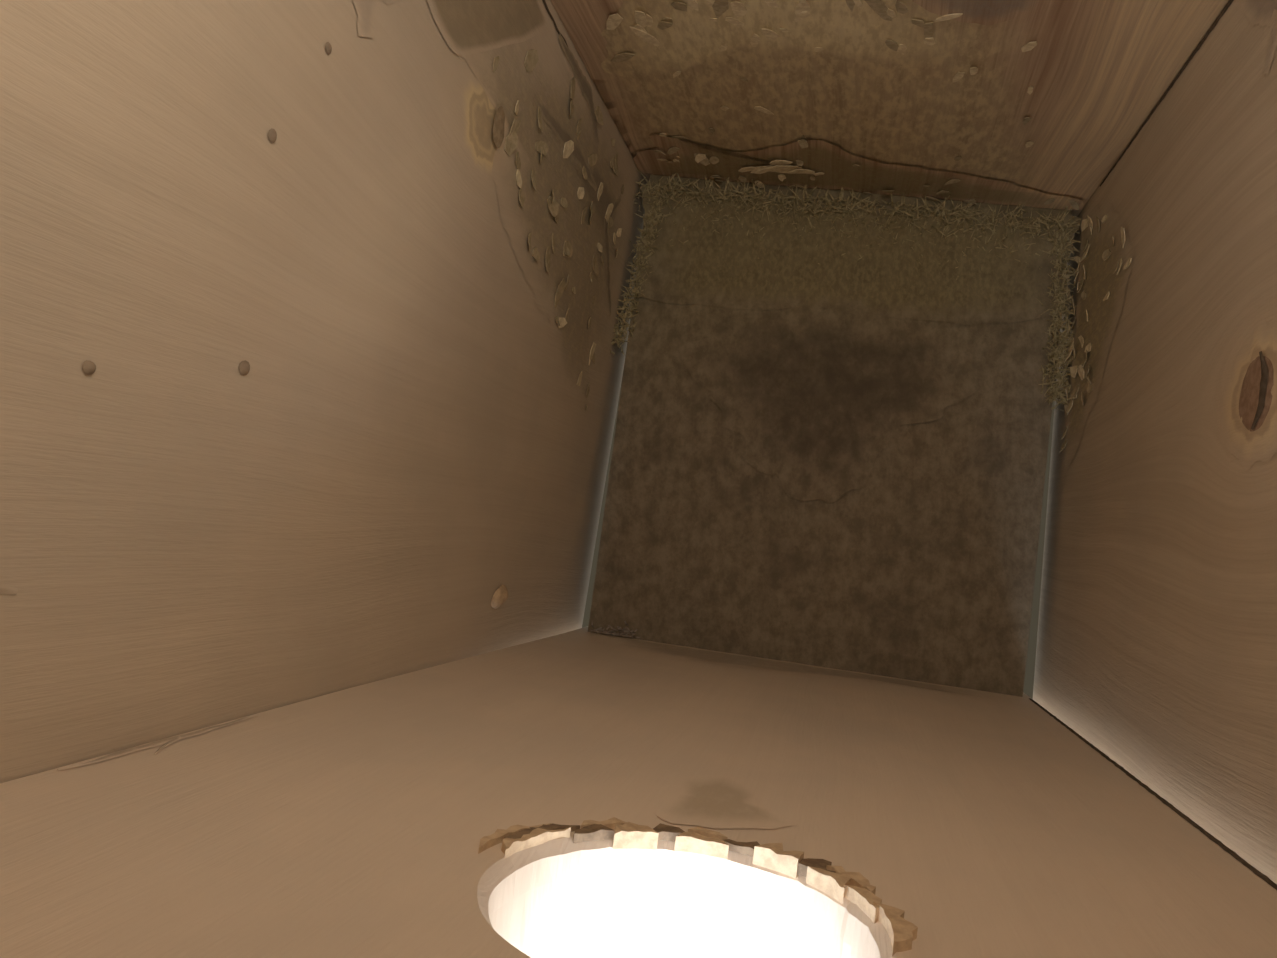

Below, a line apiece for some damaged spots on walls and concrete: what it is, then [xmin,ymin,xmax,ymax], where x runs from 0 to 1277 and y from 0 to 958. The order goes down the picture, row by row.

water stain [427,0,1081,432]
water stain [677,301,978,503]